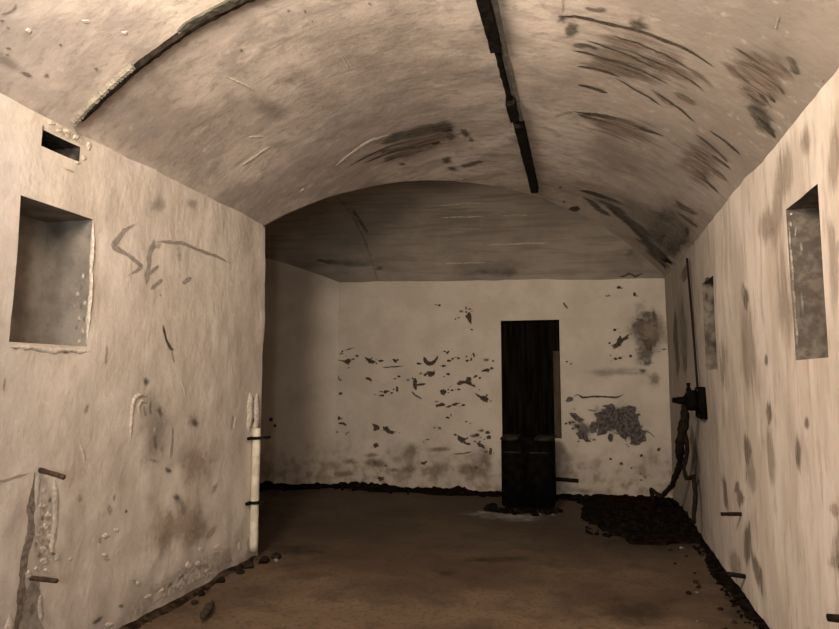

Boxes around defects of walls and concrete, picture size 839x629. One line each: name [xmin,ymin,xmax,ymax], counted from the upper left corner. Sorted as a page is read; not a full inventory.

water stain [573,35,707,122]
water stain [724,47,798,138]
water stain [348,122,472,167]
water stain [579,190,698,269]
water stain [742,286,754,384]
peeling [338,348,475,399]
peeling [435,359,494,419]
peeling [454,430,494,455]
peeling [565,394,654,457]
water stain [723,436,754,507]
spalling [4,473,73,629]
water stain [732,523,762,593]